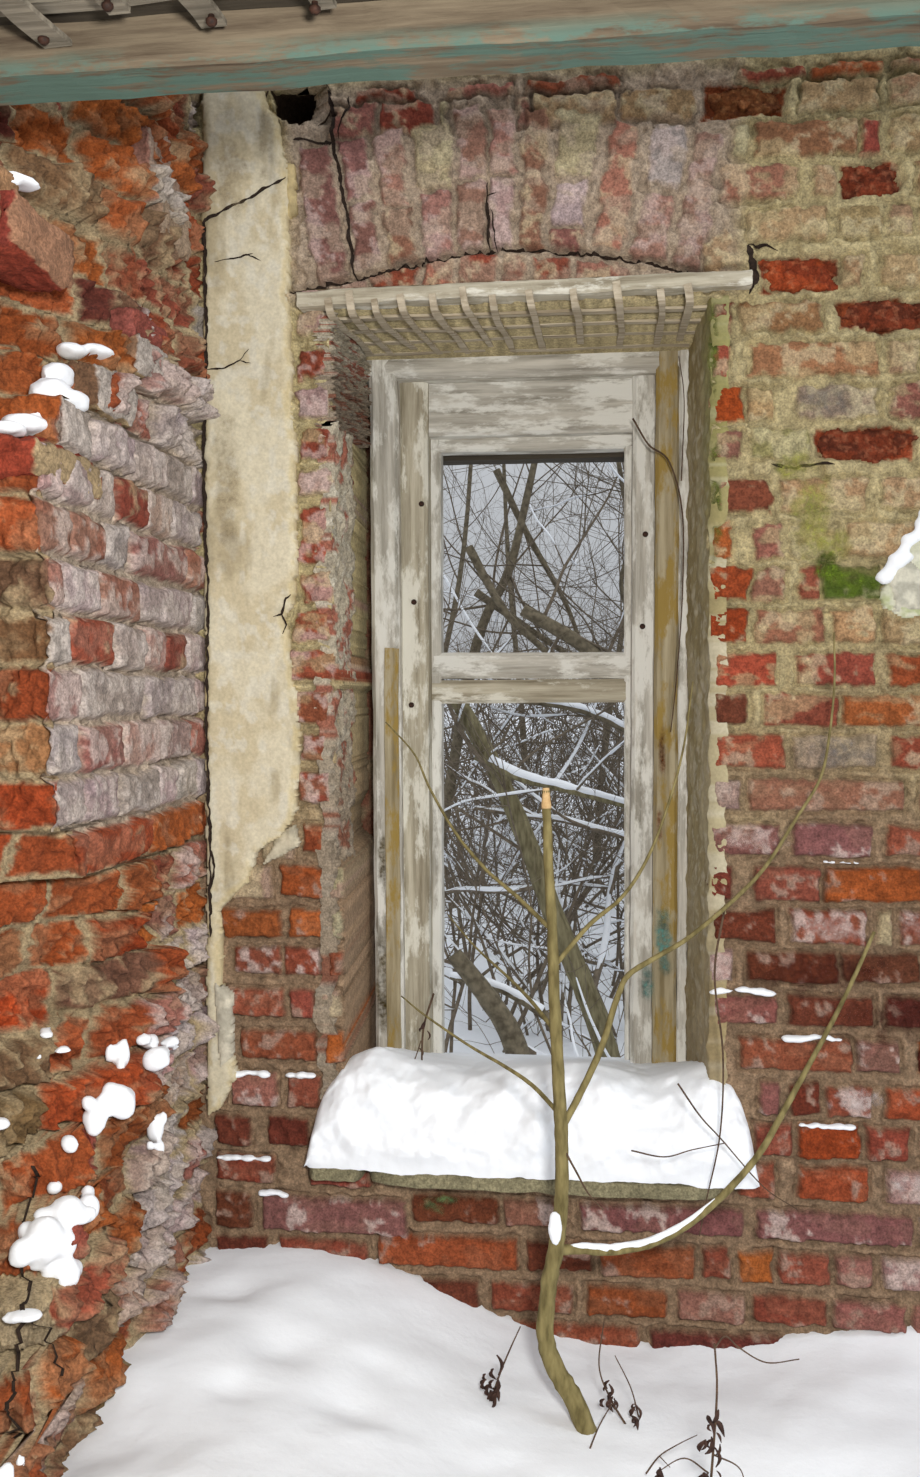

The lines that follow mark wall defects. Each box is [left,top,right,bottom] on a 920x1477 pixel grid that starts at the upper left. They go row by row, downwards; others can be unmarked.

crack [201,177,286,379]
crack [291,90,688,294]
crack [747,243,778,294]
crack [202,420,215,937]
peeling [131,84,331,1115]